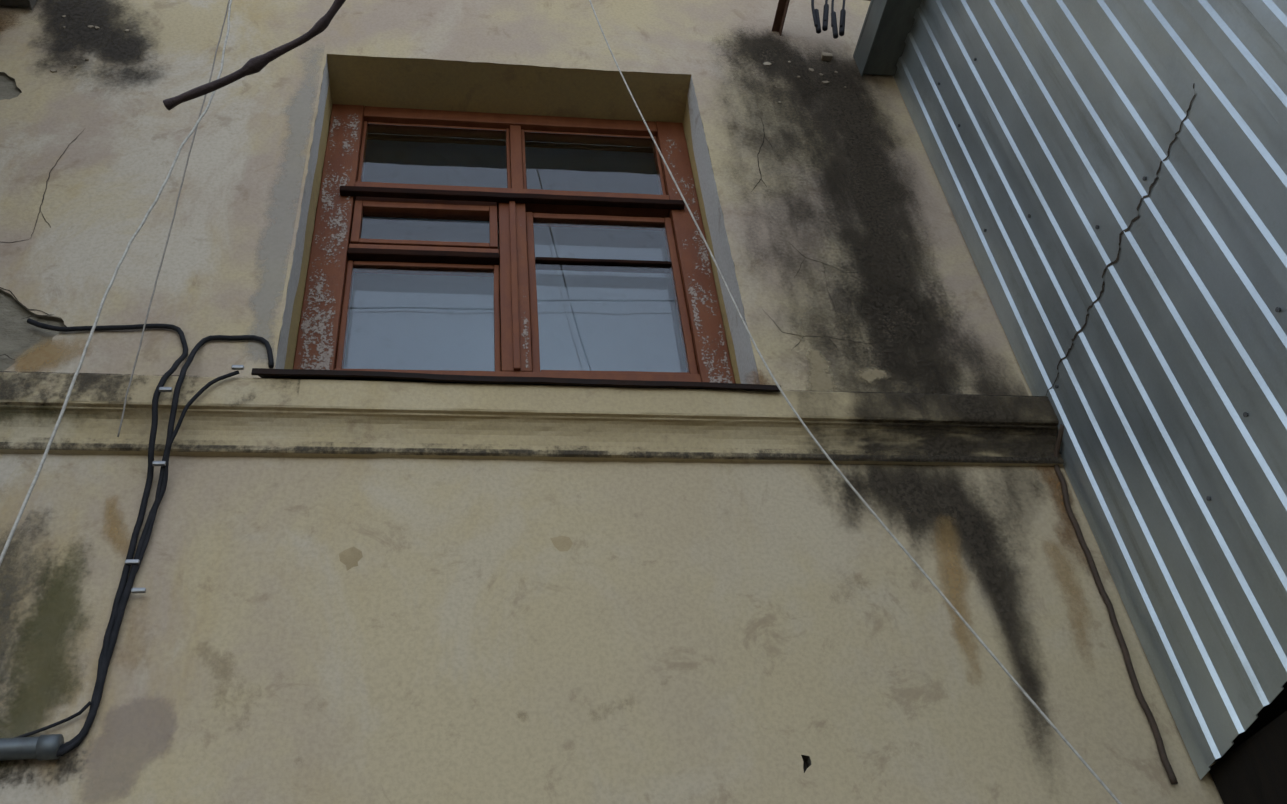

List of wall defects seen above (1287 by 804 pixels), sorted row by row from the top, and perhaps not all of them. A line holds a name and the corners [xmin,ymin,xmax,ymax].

spalling [0,72,22,100]
water stain [36,0,154,83]
crack [0,287,61,319]
spalling [0,289,67,372]
crack [11,130,84,243]
peeling [299,114,360,370]
peeling [665,140,733,383]
water stain [733,35,1064,728]
water stain [0,527,51,684]